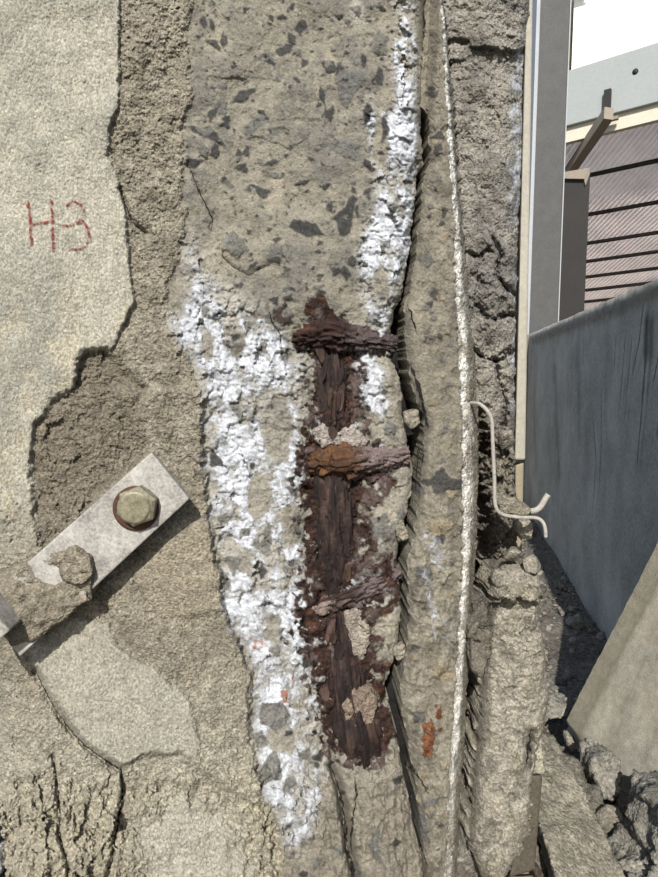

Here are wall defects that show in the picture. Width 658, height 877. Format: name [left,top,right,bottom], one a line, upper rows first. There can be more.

leakage [360,2,420,338]
spalling [0,0,424,877]
corrosion [272,301,291,323]
corrosion [304,294,349,323]
leakage [355,354,389,416]
crack [390,304,429,484]
leakage [174,252,322,846]
corrosion [281,344,401,770]
crack [35,671,125,877]
crack [330,765,358,877]
crack [385,665,429,849]
corrosion [421,705,442,757]